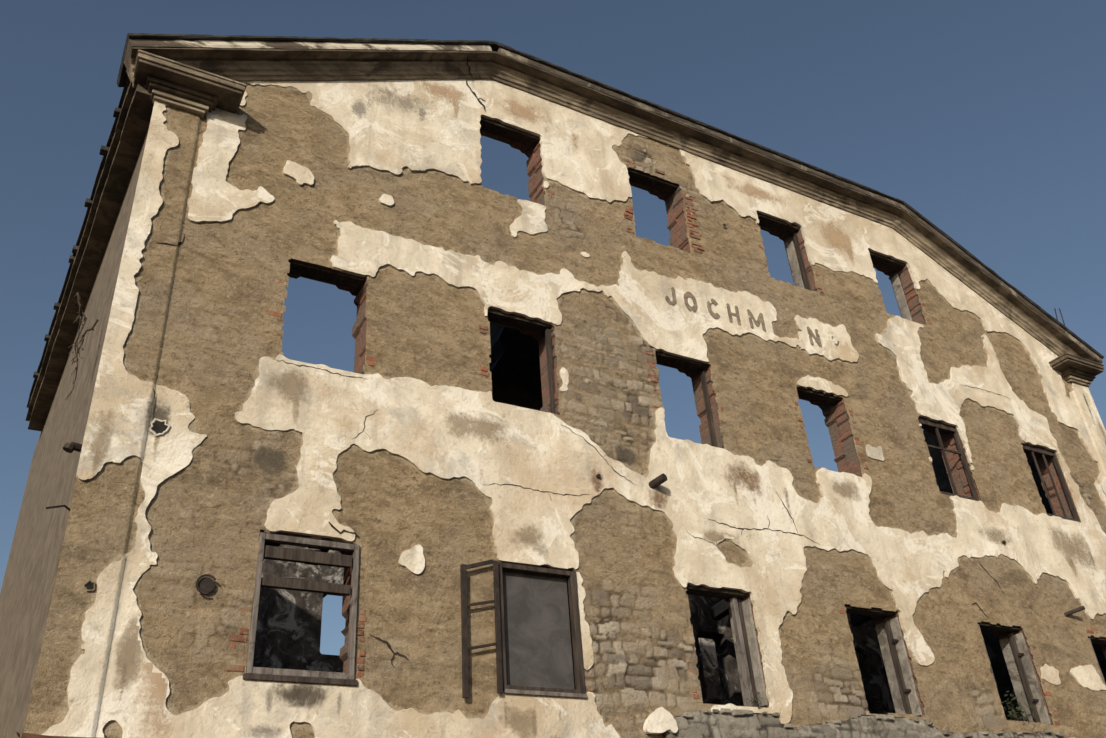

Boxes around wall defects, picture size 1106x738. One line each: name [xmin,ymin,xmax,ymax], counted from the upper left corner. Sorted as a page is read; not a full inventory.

flaking render [24,84,957,738]
crack [482,483,589,500]
crack [690,492,820,548]
crack [371,635,409,668]
flaking render [779,547,1106,738]